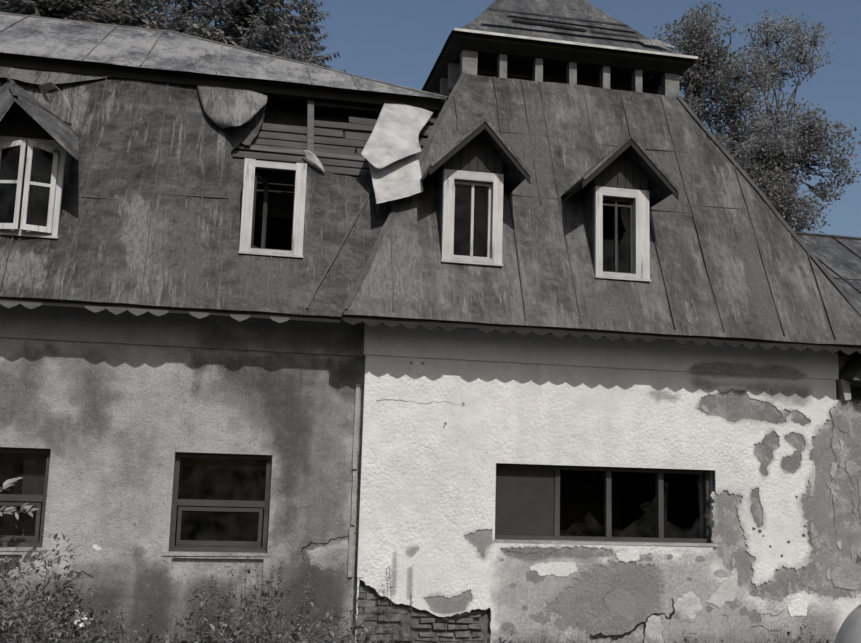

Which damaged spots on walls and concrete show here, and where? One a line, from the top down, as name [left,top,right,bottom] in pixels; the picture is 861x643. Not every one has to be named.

flaking render [695,389,861,623]
flaking render [353,551,514,643]
flaking render [464,529,675,639]
crack [590,598,675,643]